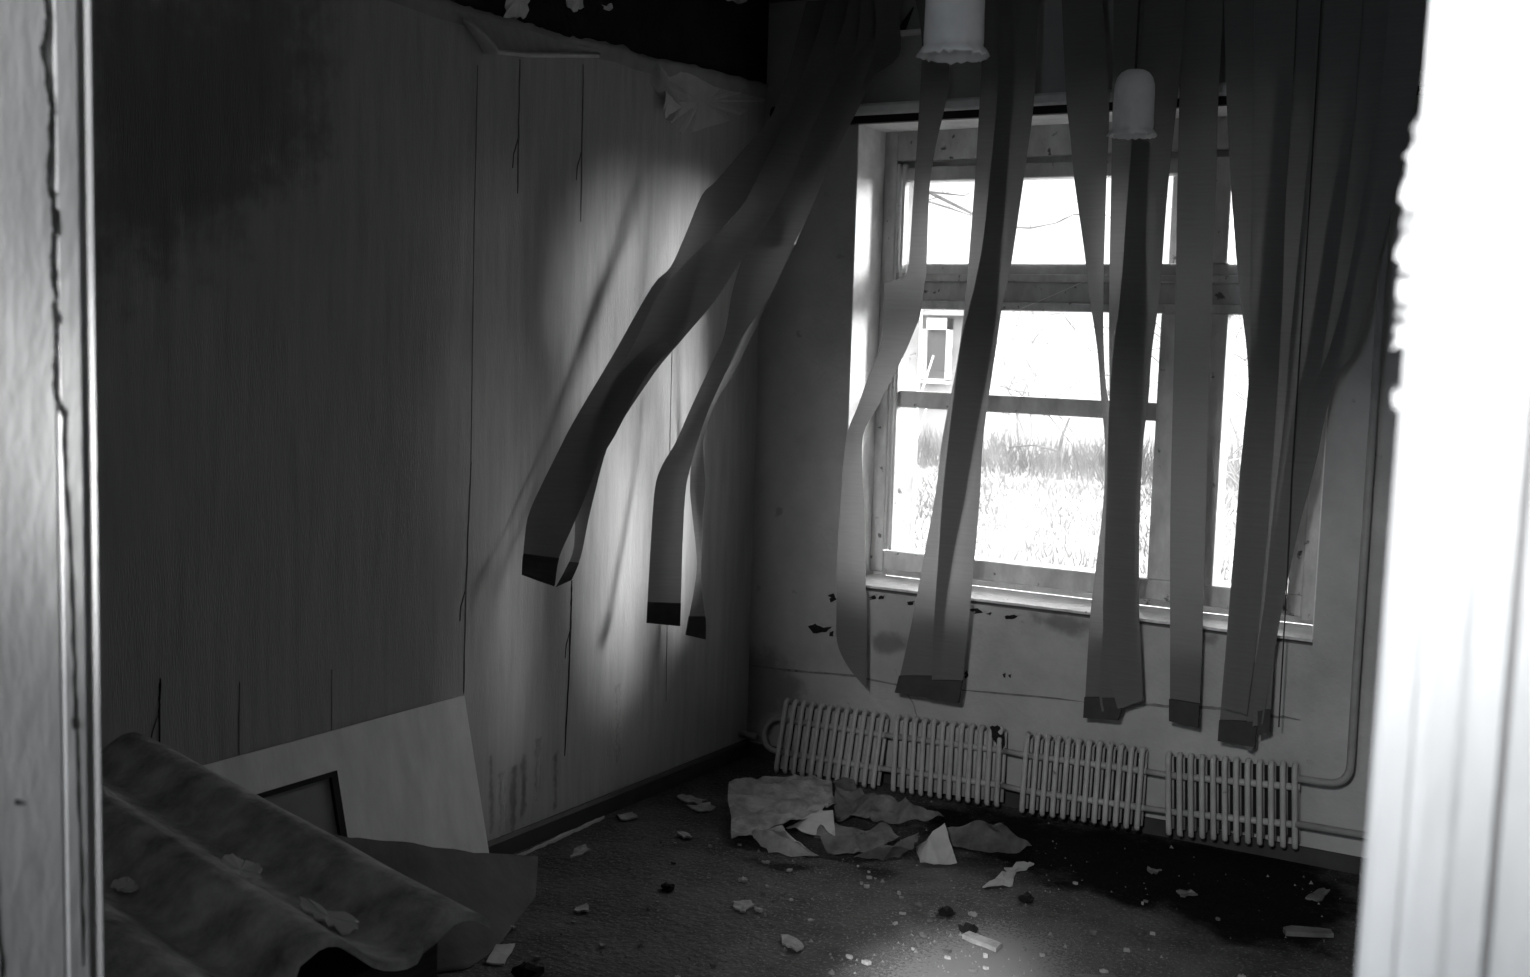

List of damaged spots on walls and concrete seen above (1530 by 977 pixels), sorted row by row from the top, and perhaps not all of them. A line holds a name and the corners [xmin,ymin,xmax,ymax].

peeling [387,0,769,134]
crack [39,0,84,966]
peeling [808,621,836,637]
peeling [970,607,1024,619]